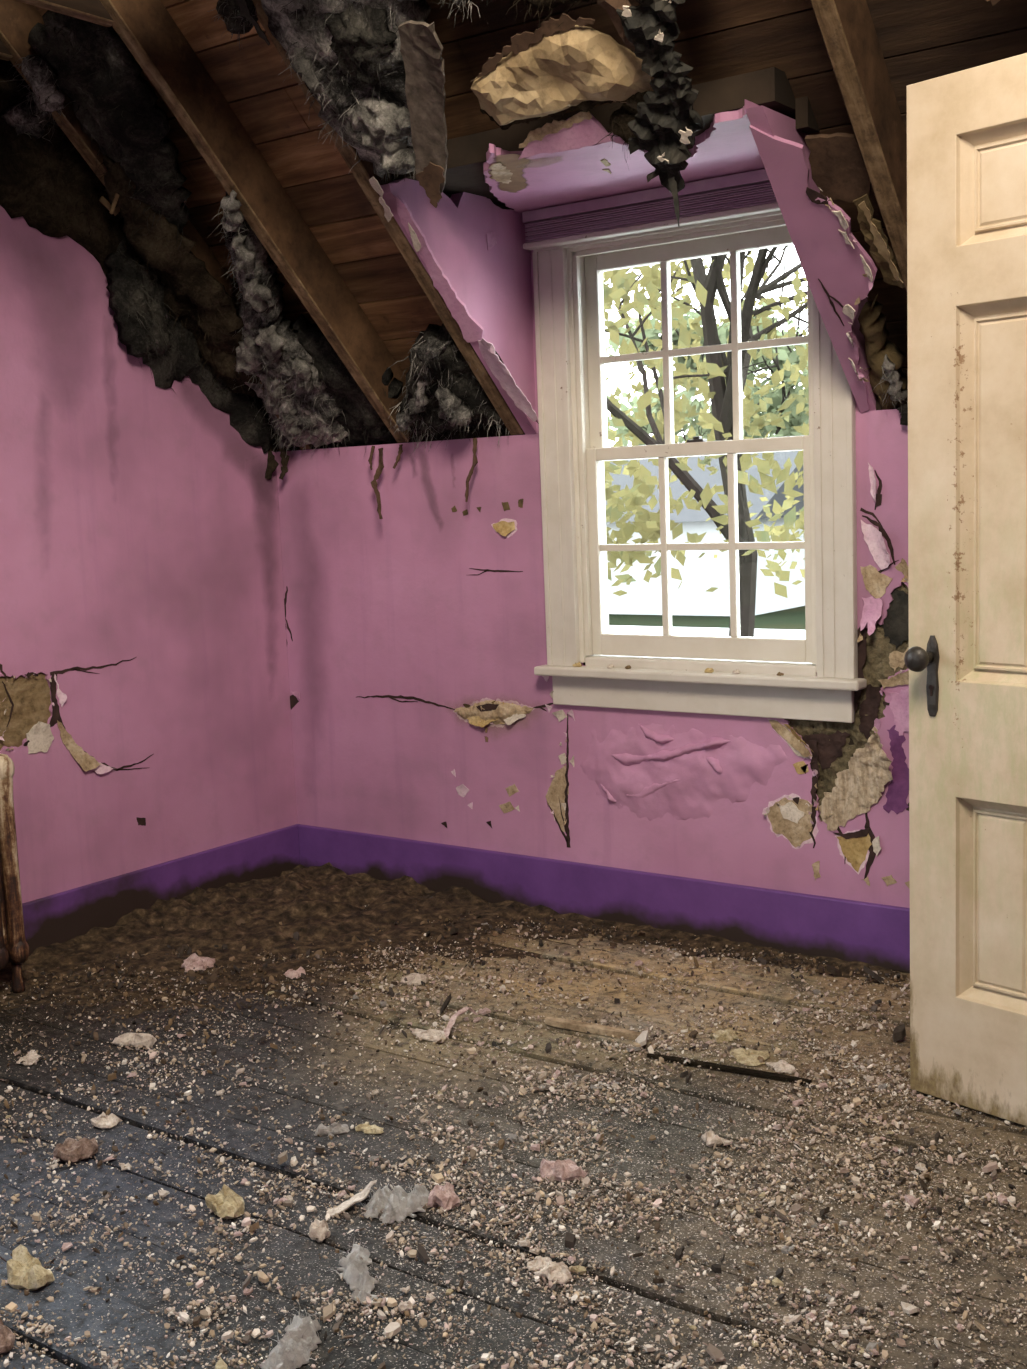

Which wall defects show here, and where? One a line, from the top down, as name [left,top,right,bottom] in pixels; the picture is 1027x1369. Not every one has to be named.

flaking render [369,176,539,424]
peeling [491,499,523,538]
spalling [0,672,100,772]
crack [50,657,136,676]
crack [84,751,153,774]
crack [357,695,455,710]
crack [533,703,574,848]
spalling [762,463,910,889]